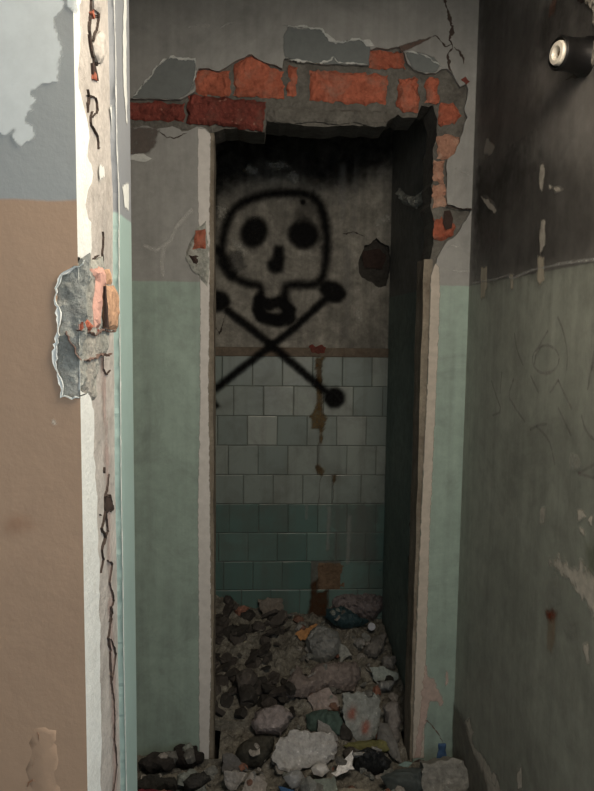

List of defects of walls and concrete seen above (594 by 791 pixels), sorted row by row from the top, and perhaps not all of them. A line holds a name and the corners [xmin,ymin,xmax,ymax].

peeling [0,0,77,146]
crack [86,0,100,149]
crack [435,0,465,72]
crack [92,232,105,262]
flaking render [52,241,121,423]
flaking render [110,0,470,759]
corrosion [310,357,327,443]
crack [99,467,118,791]
flaking render [111,587,127,791]
peeling [452,705,500,791]